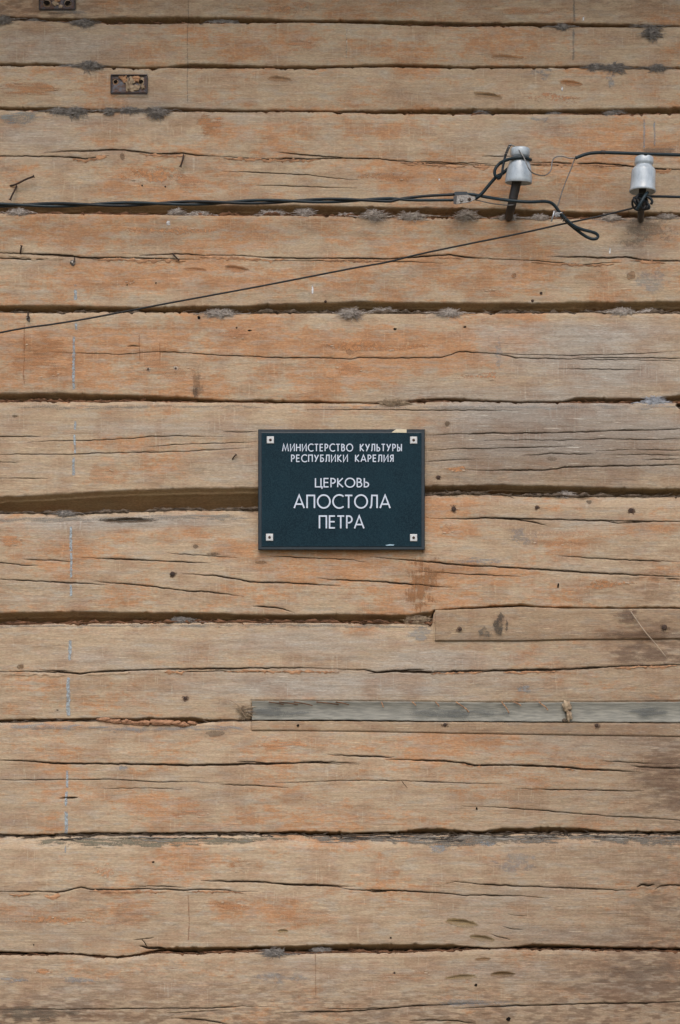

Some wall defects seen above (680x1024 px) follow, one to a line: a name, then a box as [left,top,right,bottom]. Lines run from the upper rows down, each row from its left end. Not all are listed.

rust [118,75,145,92]
crack [2,149,502,188]
crack [0,252,679,267]
crack [427,517,680,525]
crack [0,553,679,613]
crack [5,754,680,820]
crack [0,880,680,940]